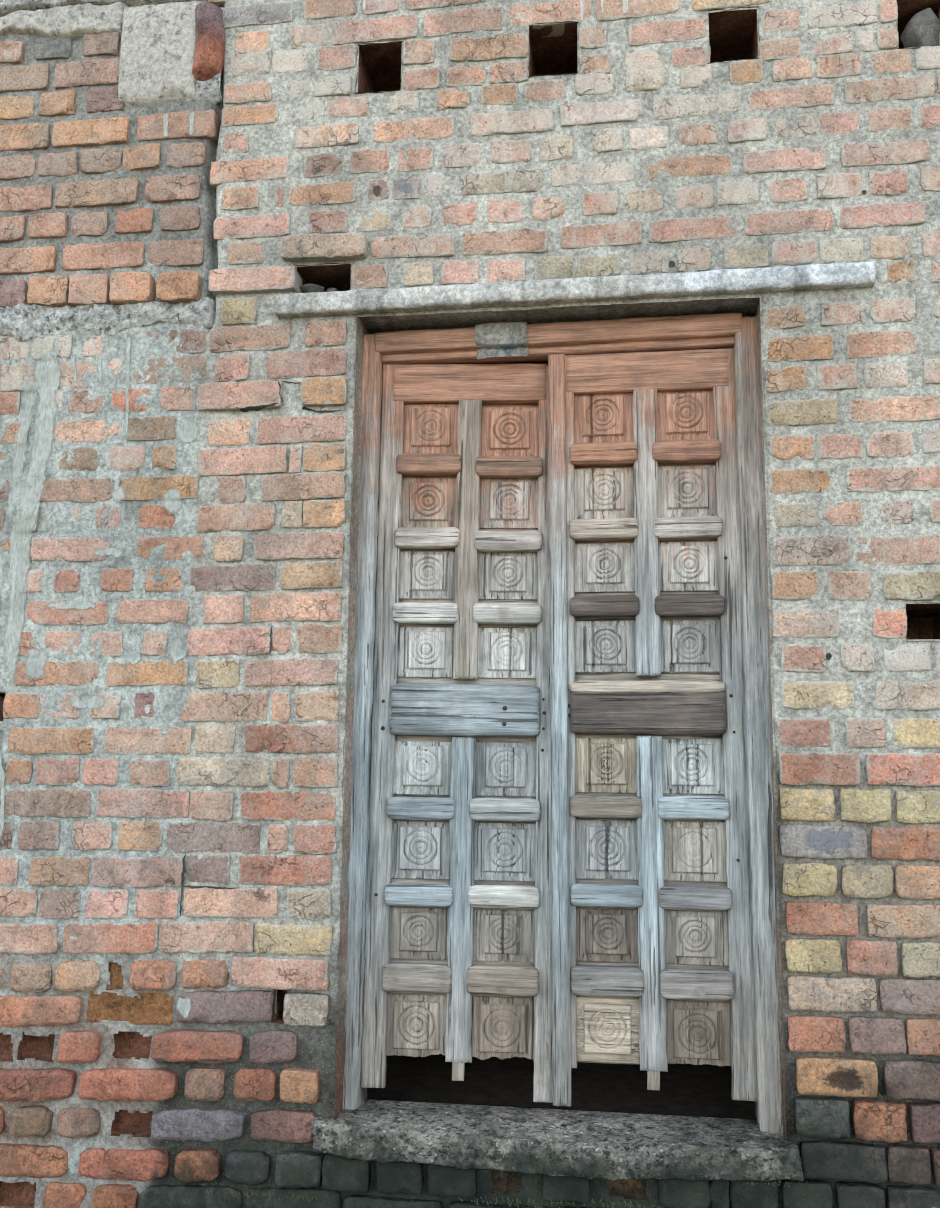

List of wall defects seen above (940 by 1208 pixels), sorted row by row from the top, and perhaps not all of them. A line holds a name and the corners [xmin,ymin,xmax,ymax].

spalling [86,962,174,1060]
spalling [0,1032,55,1062]
spalling [111,1110,152,1138]
spalling [0,1181,36,1207]